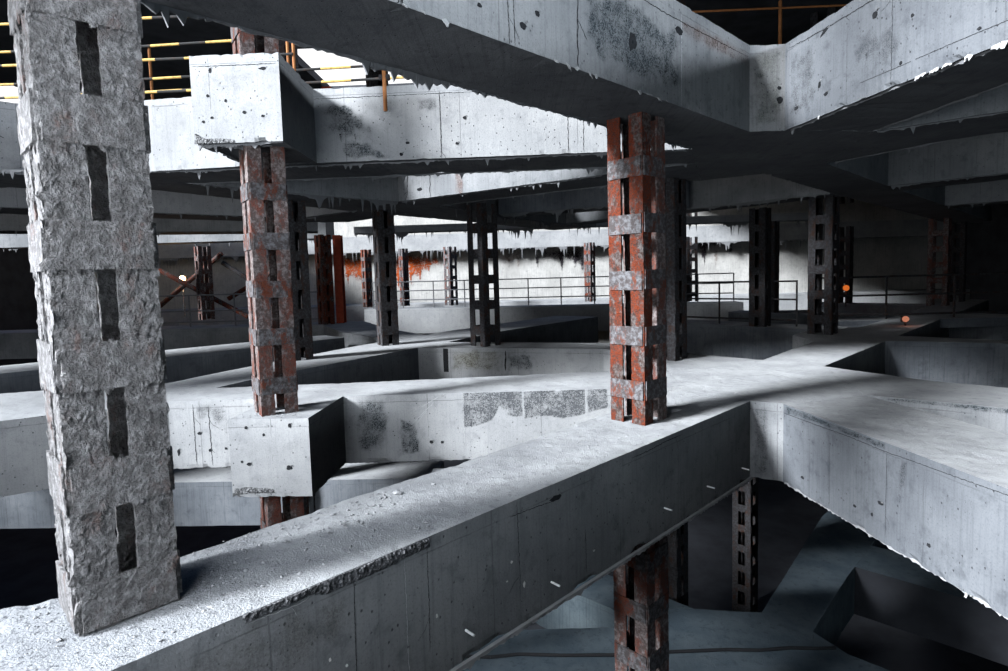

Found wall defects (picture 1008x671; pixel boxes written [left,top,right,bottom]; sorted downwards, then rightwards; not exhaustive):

leakage [589,0,678,85]
crack [789,0,1008,82]
corrosion [344,258,362,280]
corrosion [396,256,438,286]
peeling [463,389,608,427]
crack [785,413,1008,496]